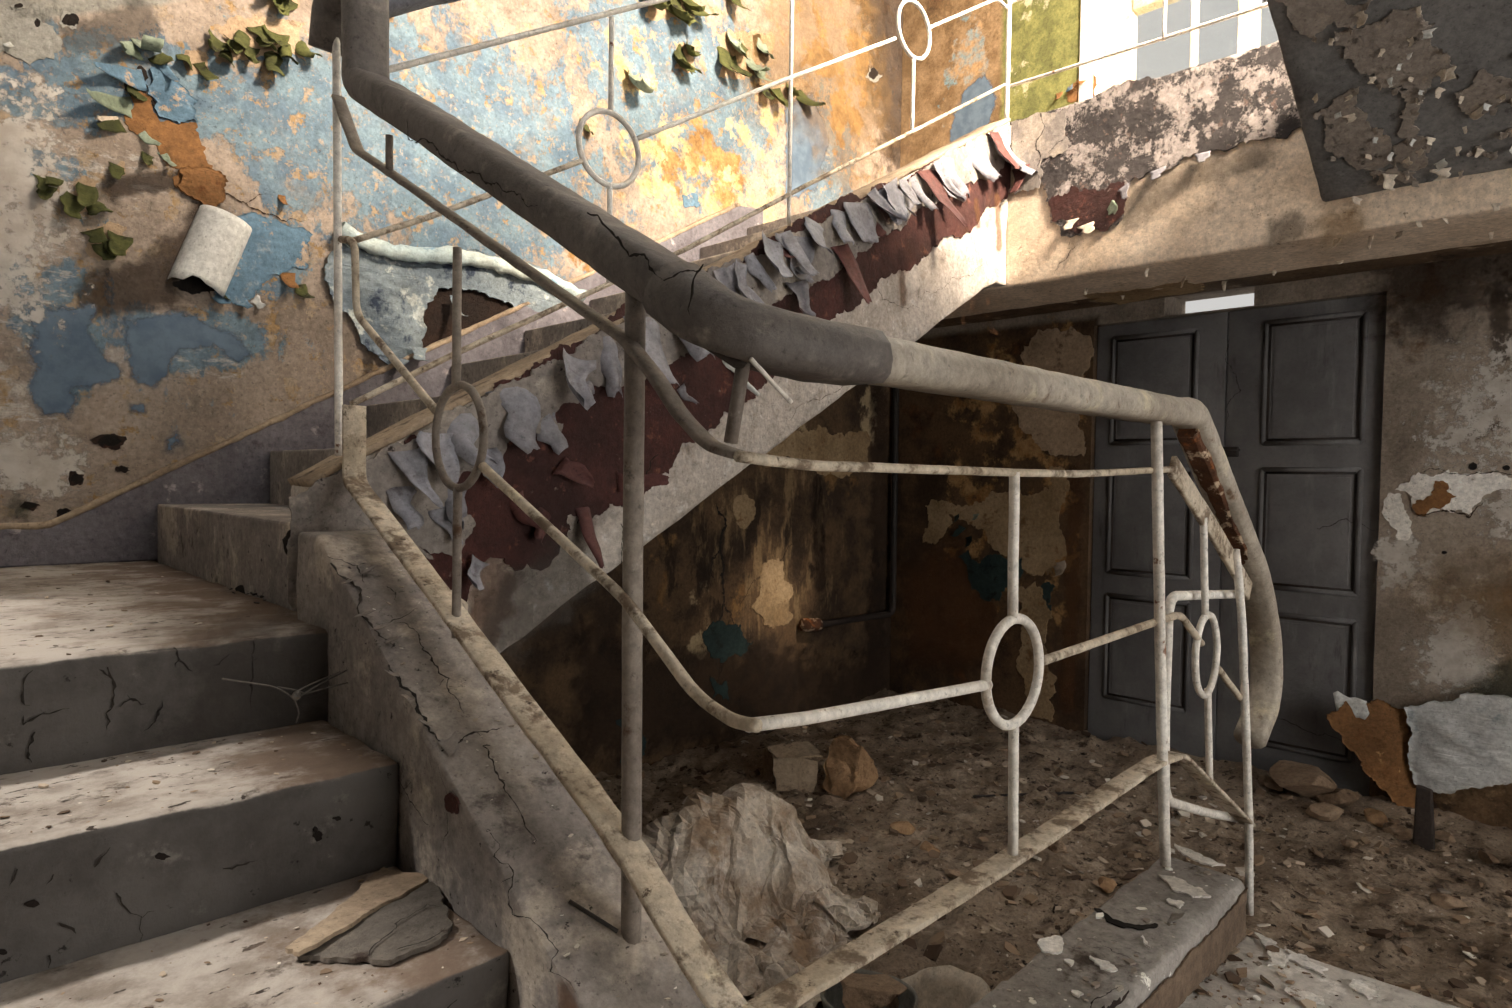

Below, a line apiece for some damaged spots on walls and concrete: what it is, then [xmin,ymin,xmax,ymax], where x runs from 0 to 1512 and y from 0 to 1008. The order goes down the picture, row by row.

peeling [33,0,323,309]
peeling [645,0,829,201]
peeling [706,0,1512,320]
crack [21,670,69,763]
crack [329,557,577,994]
peeling [366,303,625,612]
leakage [566,627,622,765]
peeling [644,313,774,494]
leakage [642,386,891,754]
peeling [922,405,1086,722]
corrosion [1177,429,1248,565]
spalling [1382,462,1512,541]